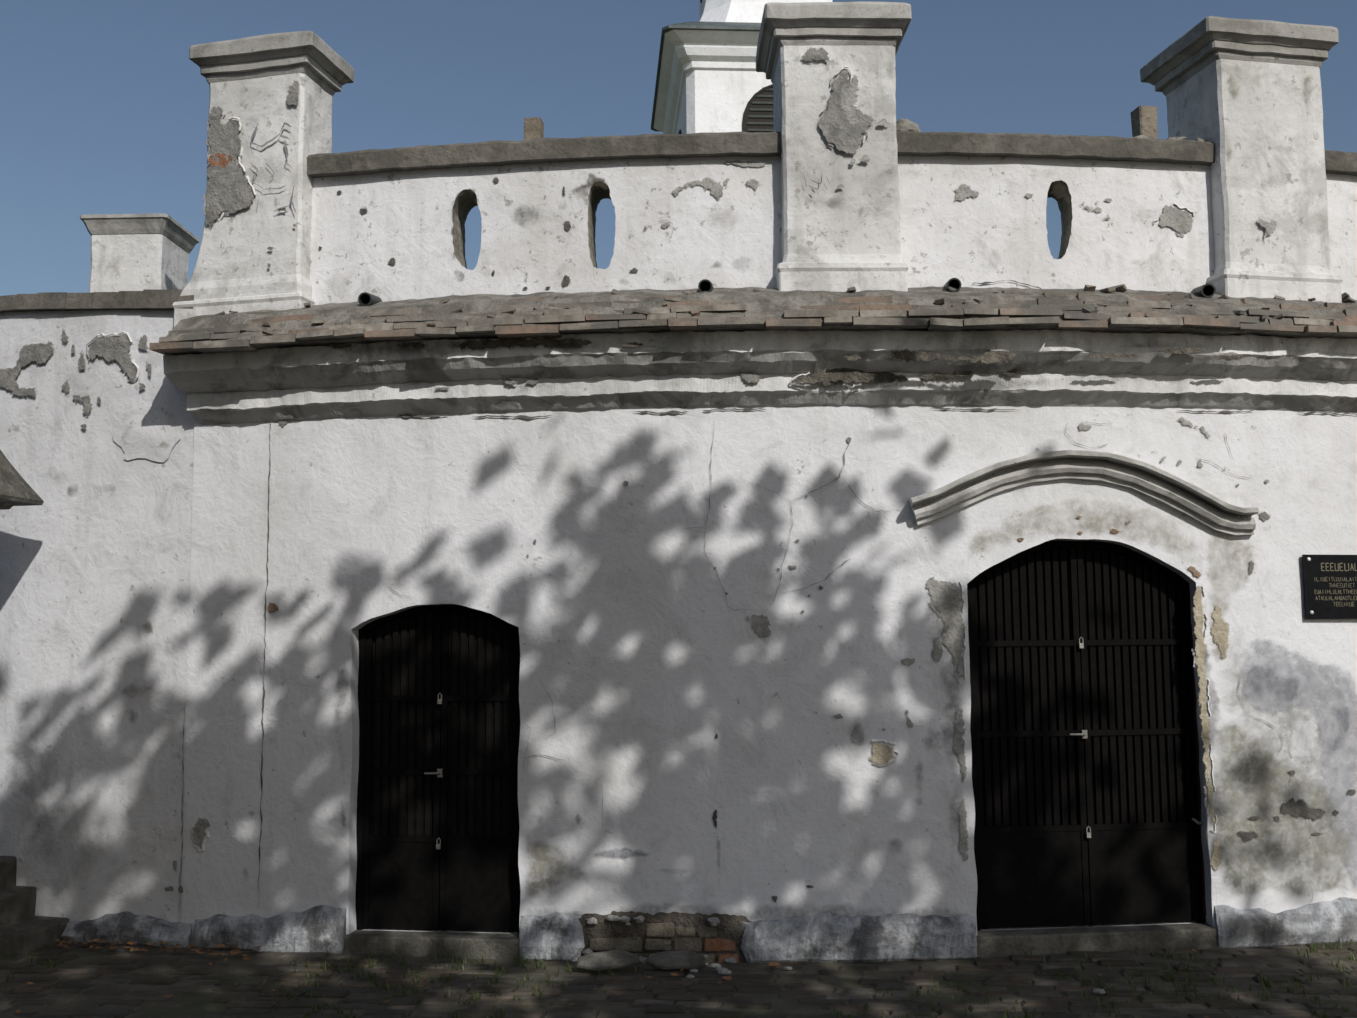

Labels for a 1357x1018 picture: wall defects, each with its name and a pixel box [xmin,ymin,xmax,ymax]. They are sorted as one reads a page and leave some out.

spalling [802,47,890,165]
spalling [203,106,256,227]
peeling [0,329,152,430]
crack [634,408,882,612]
crack [258,422,271,904]
spalling [926,577,967,685]
spalling [953,708,967,783]
peeling [1185,566,1229,871]
spalling [958,800,969,861]
peeling [1237,798,1339,842]
flaking render [578,911,752,963]